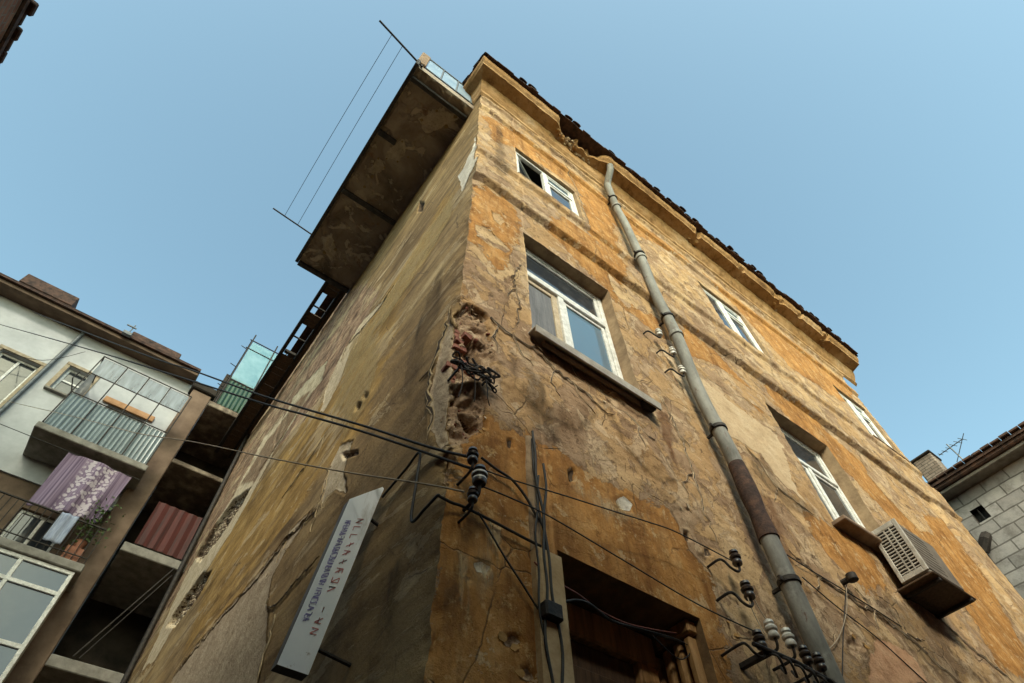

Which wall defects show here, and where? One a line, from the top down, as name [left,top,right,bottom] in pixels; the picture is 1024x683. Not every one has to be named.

flaking render [458,137,477,191]
spalling [430,306,493,449]
crack [419,263,717,541]
flaking render [142,298,387,683]
flaking render [616,496,632,511]